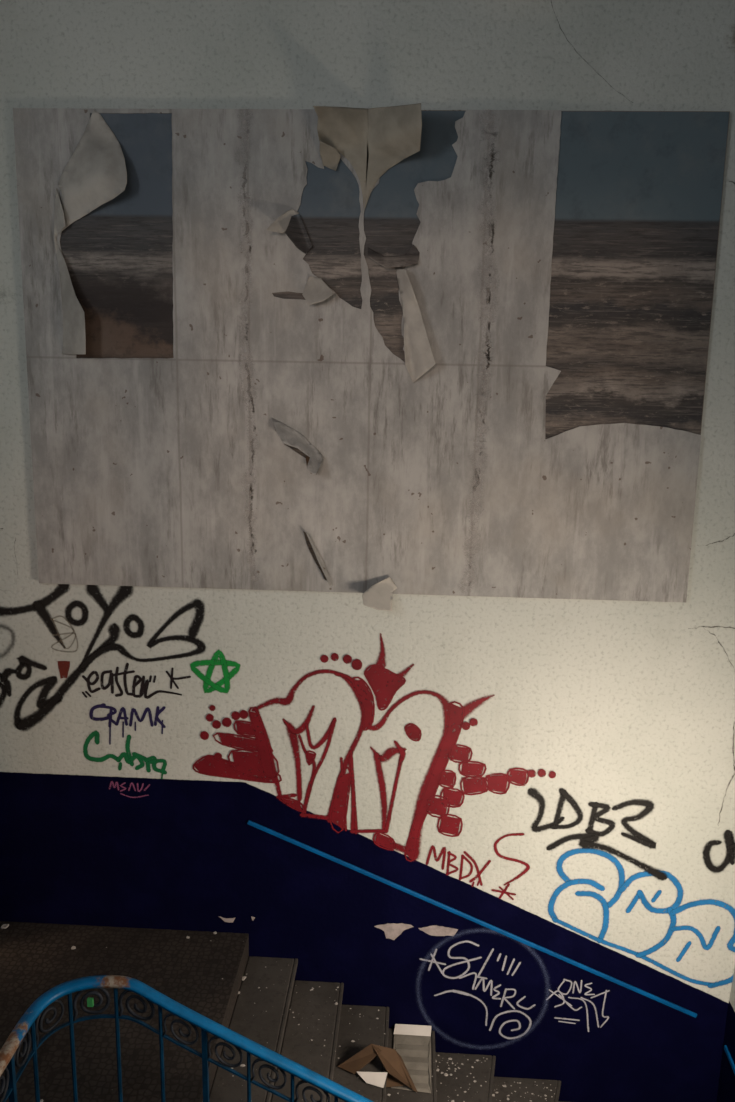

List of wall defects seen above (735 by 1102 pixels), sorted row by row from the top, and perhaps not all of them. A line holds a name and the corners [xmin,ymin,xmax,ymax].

crack [718,726,735,823]
peeling [374,923,458,940]